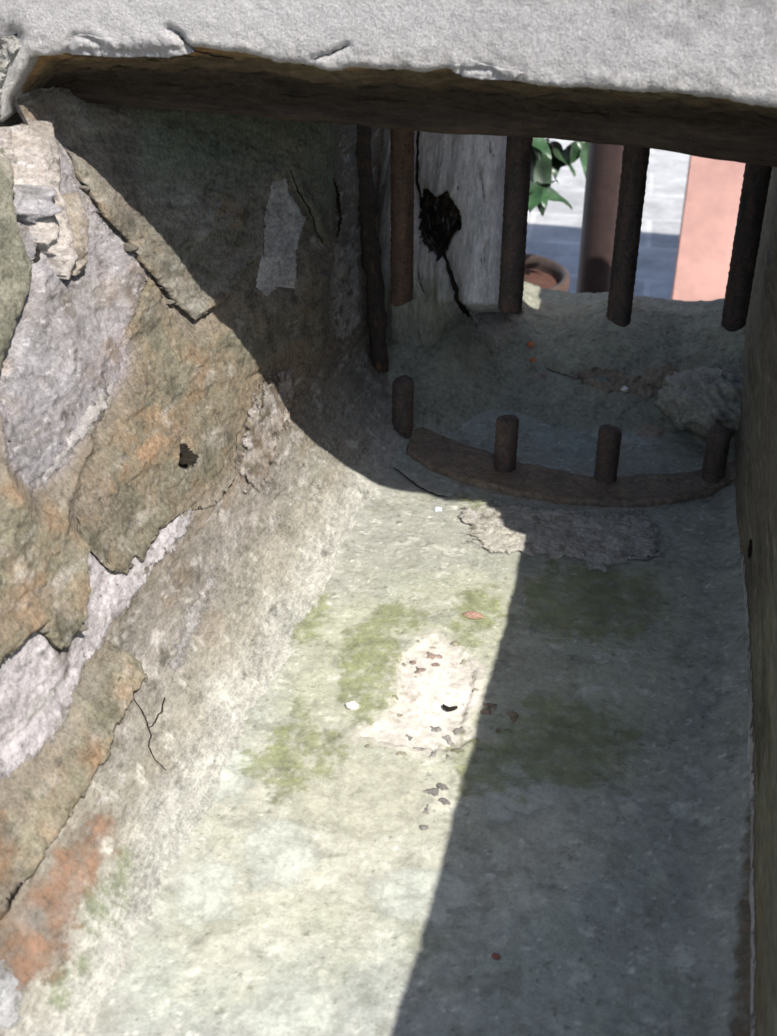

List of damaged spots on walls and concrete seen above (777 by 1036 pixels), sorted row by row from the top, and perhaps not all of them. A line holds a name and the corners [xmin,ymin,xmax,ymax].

spalling [0,35,20,123]
peeling [22,29,777,320]
crack [415,131,423,209]
crack [443,252,471,317]
peeling [0,120,361,921]
spalling [458,498,665,575]
crack [118,677,167,771]
spalling [358,640,519,759]
spalling [420,783,451,831]
peeling [741,553,757,1036]
corrosion [729,810,753,1036]
peeling [0,953,25,1028]